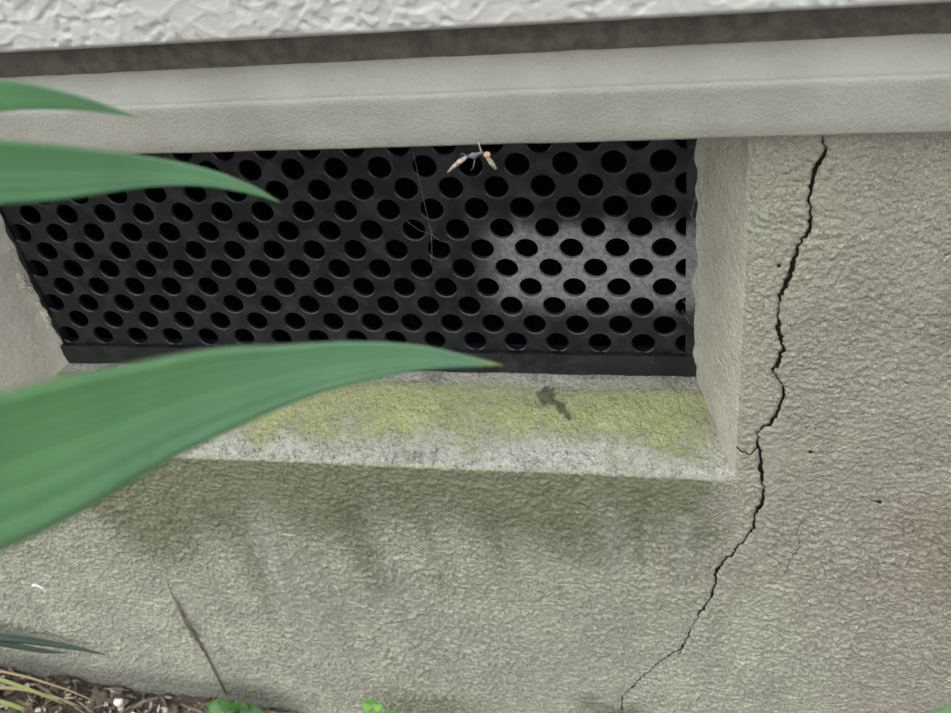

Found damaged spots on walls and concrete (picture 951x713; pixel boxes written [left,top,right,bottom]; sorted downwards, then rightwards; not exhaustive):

crack [621,136,827,711]